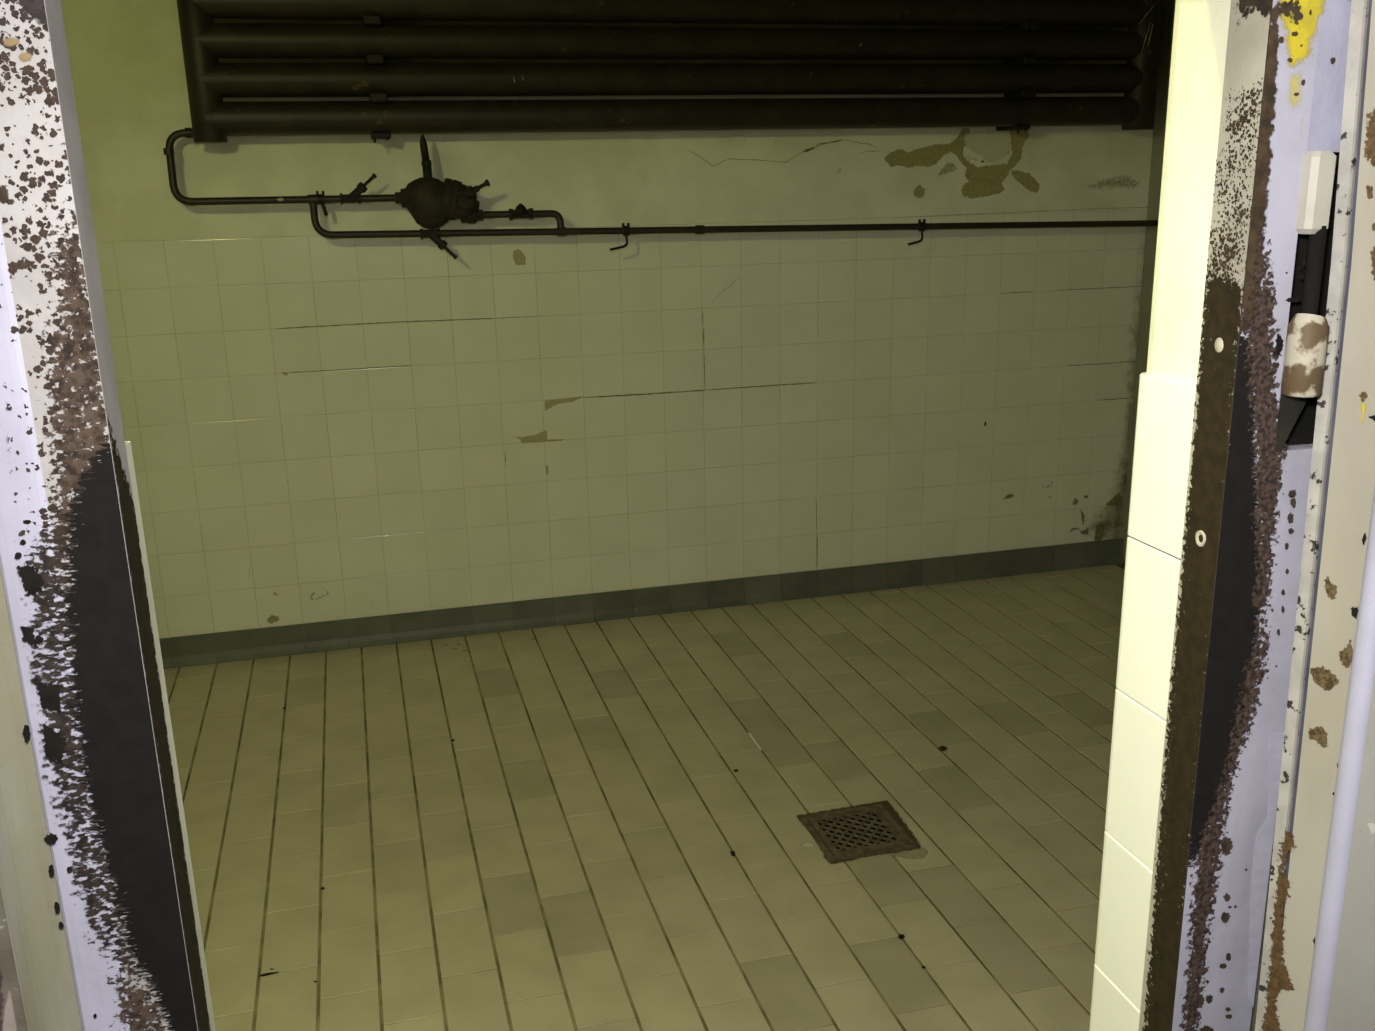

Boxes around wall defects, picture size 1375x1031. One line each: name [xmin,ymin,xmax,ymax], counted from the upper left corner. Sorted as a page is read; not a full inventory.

crack [688,134,876,173]
peeling [885,128,1039,198]
rust [1364,109,1375,166]
crack [583,277,809,398]
peeling [517,430,562,443]
rust [0,0,175,1031]
rust [1142,0,1312,1031]